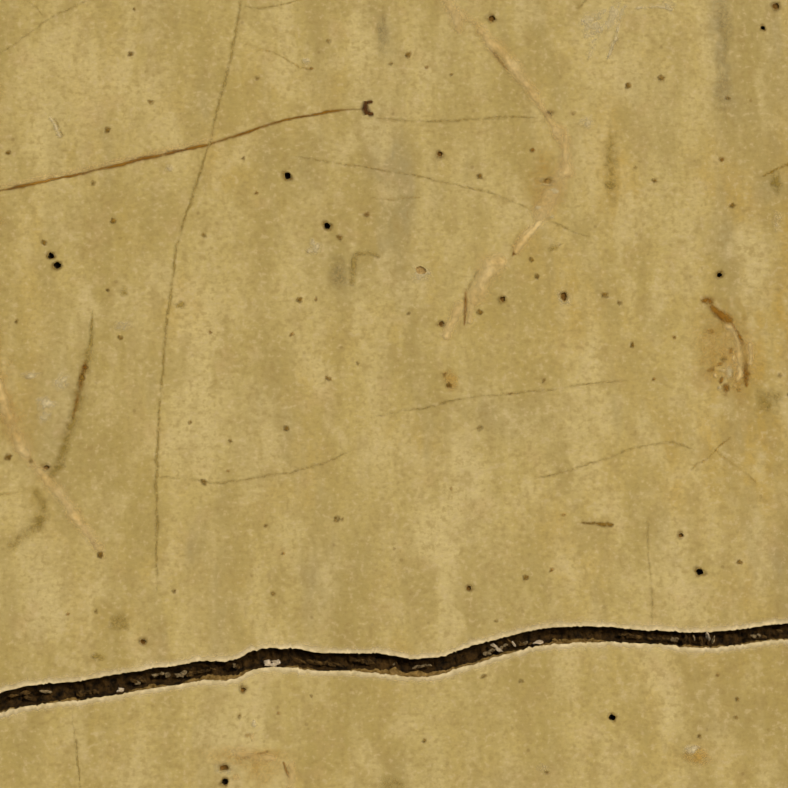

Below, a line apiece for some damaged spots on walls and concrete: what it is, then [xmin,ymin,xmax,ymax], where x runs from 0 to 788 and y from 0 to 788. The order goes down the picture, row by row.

crack [214,17,239,121]
crack [6,109,342,271]
crack [164,294,172,334]
crack [0,381,102,550]
crack [154,355,164,567]
crack [0,619,788,717]